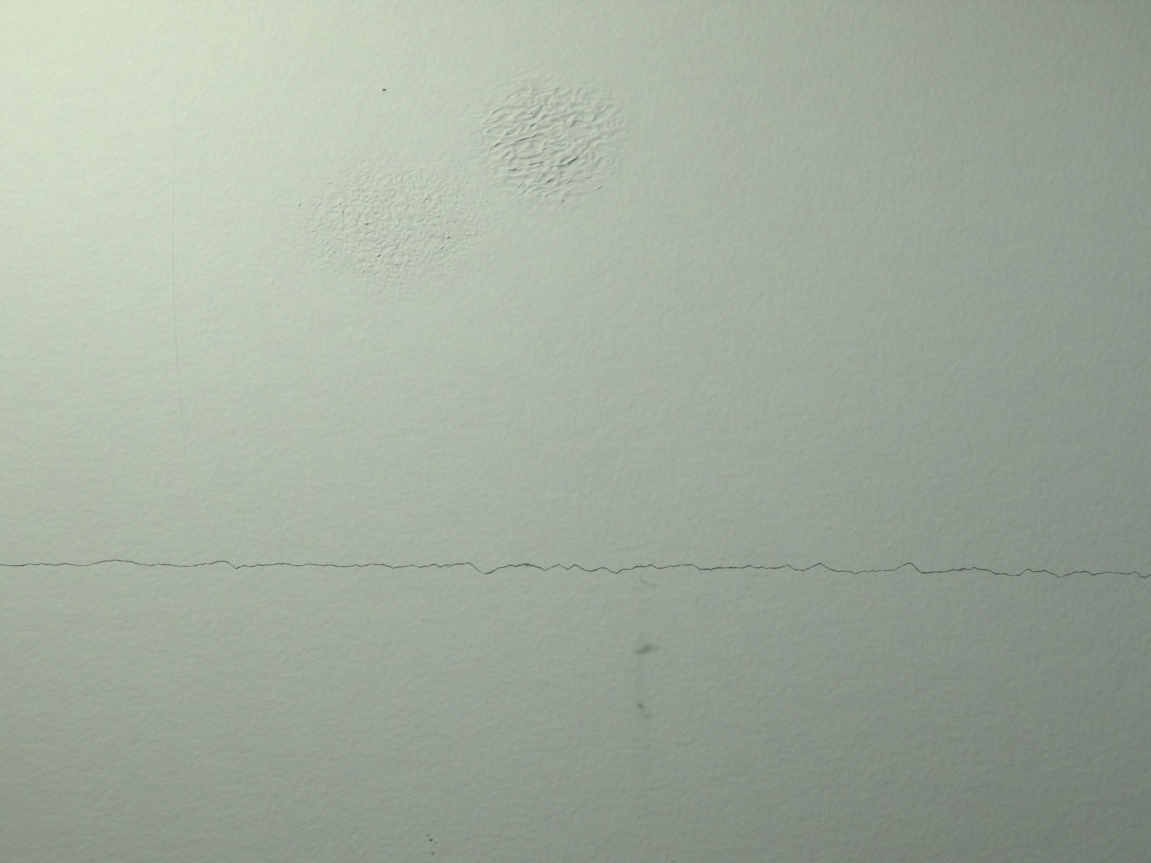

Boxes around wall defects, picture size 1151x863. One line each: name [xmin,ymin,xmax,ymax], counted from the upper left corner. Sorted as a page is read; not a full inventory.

crack [1,560,1151,579]